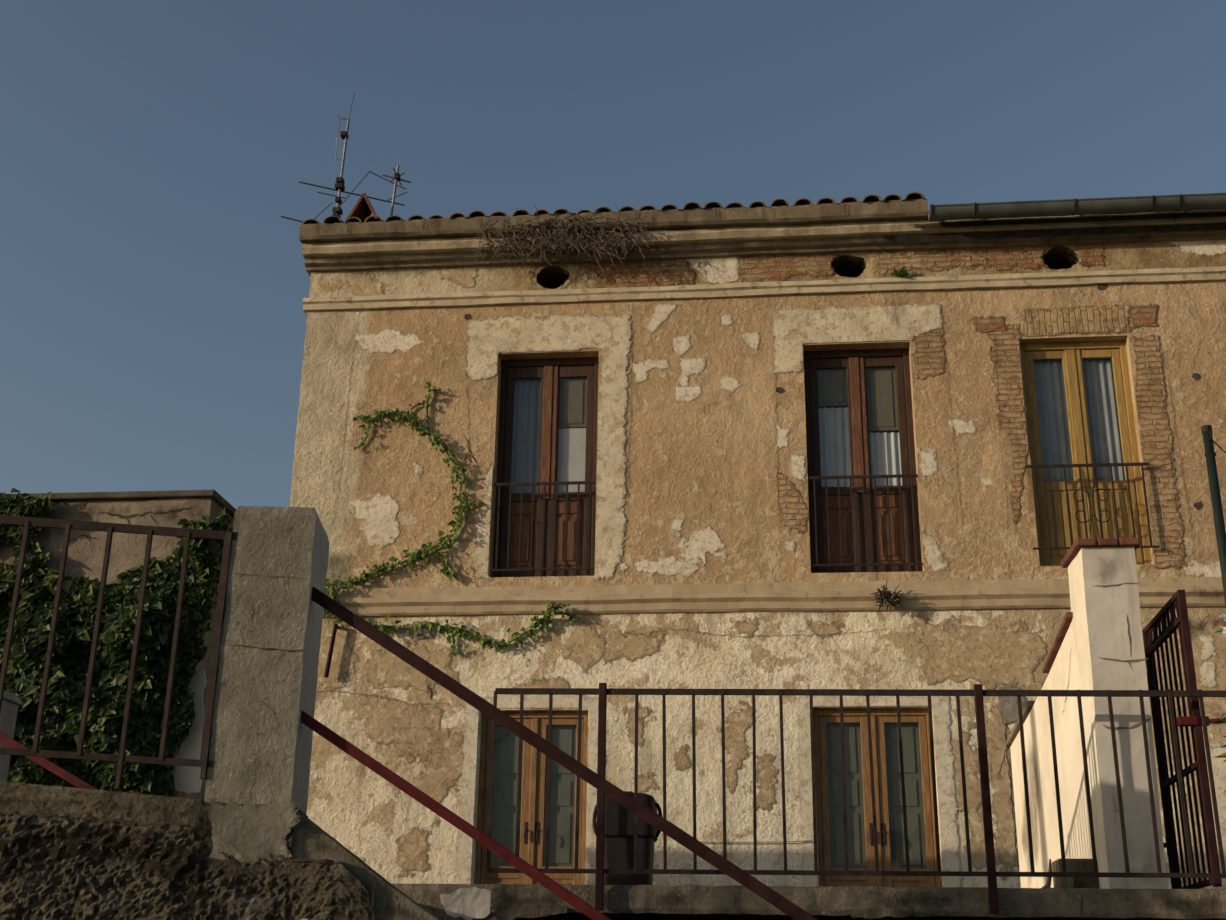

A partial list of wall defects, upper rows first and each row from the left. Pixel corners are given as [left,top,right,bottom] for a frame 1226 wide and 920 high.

flaking render [594,253,838,288]
peeling [1164,239,1226,256]
flaking render [972,303,1222,577]
crack [69,505,199,541]
peeling [349,493,403,547]
peeling [474,465,493,579]
peeling [619,515,728,577]
crack [228,622,304,661]
crack [1096,582,1146,670]
spalling [318,625,464,803]
spalling [911,614,1047,882]
crack [1102,717,1153,730]